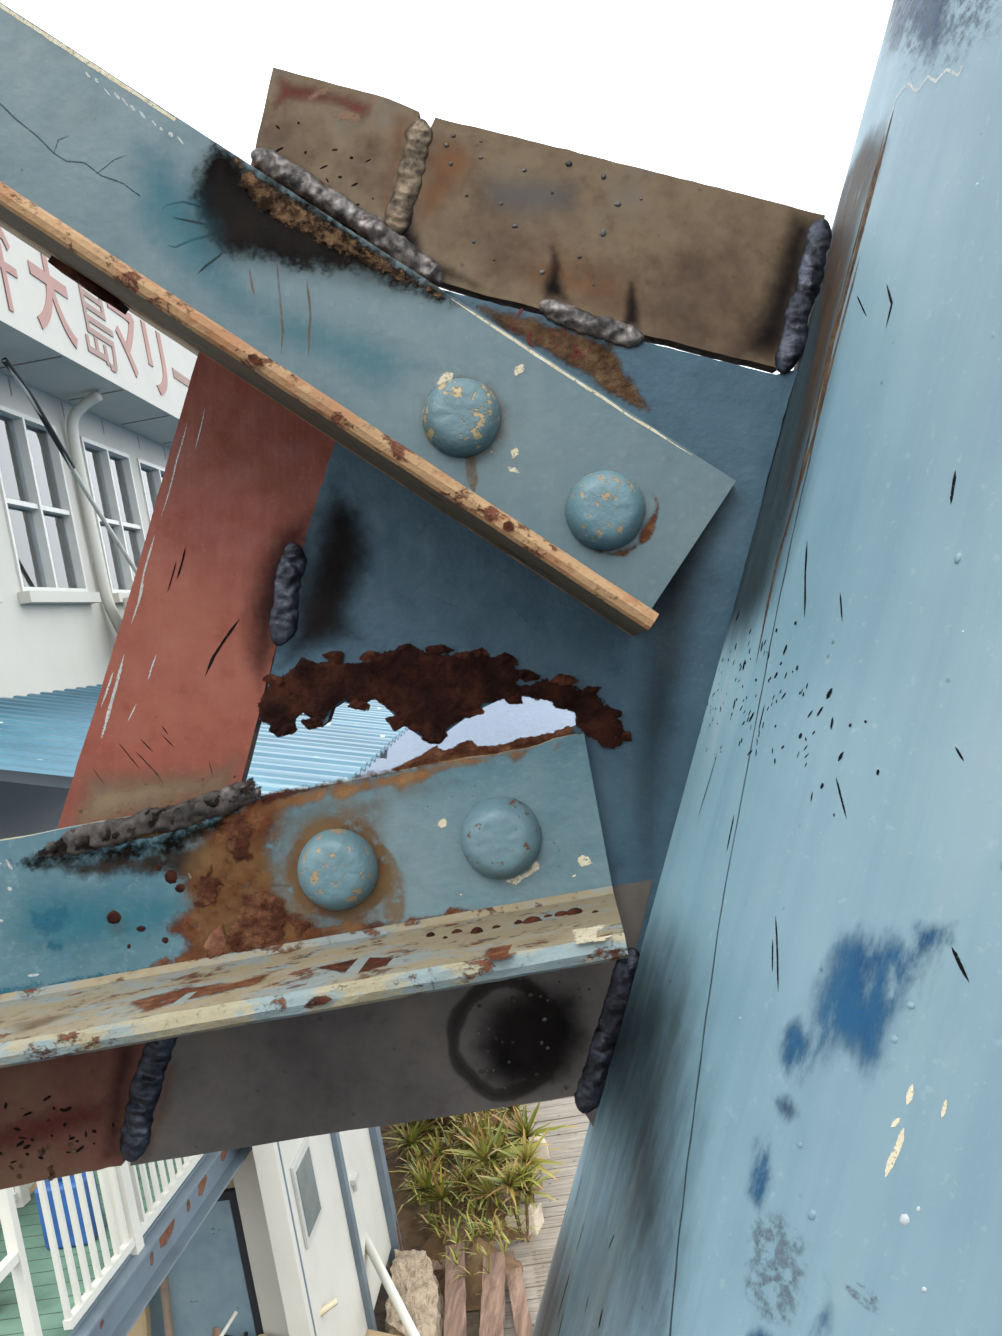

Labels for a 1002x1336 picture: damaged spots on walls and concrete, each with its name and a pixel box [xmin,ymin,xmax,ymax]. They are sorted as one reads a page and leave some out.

crack [0,103,138,195]
rust [248,353,263,366]
rust [43,643,632,968]
rust [317,958,392,973]
rust [131,975,267,1012]
rust [304,995,332,1008]
rust [26,1016,61,1029]